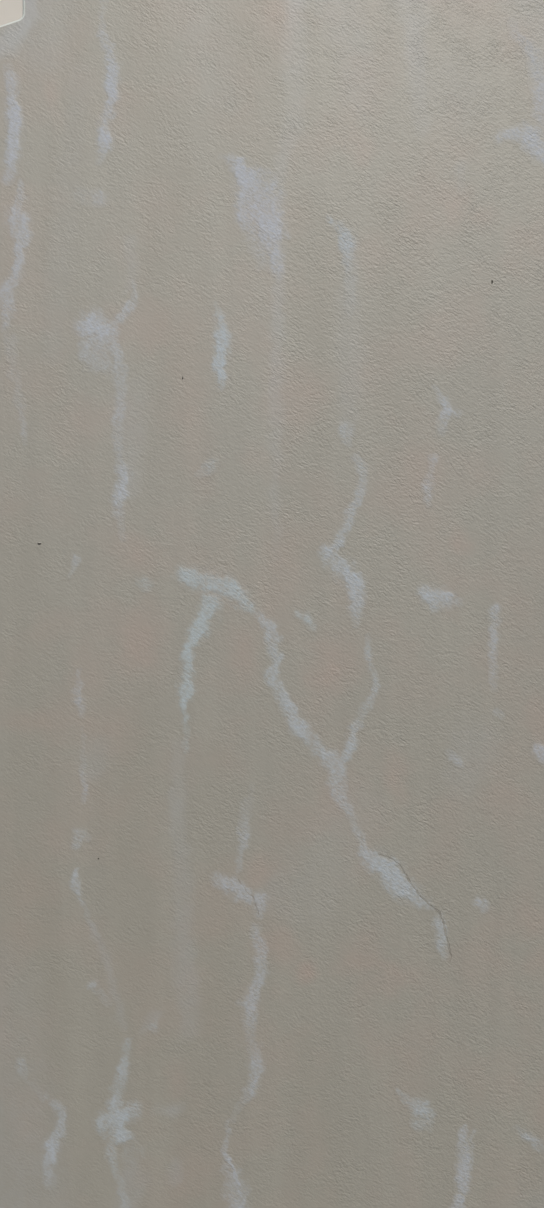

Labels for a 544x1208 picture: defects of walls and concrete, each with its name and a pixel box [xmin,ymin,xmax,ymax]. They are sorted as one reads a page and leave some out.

water stain [0,61,35,447]
water stain [216,151,293,284]
water stain [70,278,140,543]
water stain [209,300,236,392]
water stain [134,420,450,961]
crack [378,853,452,960]
water stain [208,782,273,1208]
water stain [90,1036,147,1208]
water stain [448,1123,478,1208]